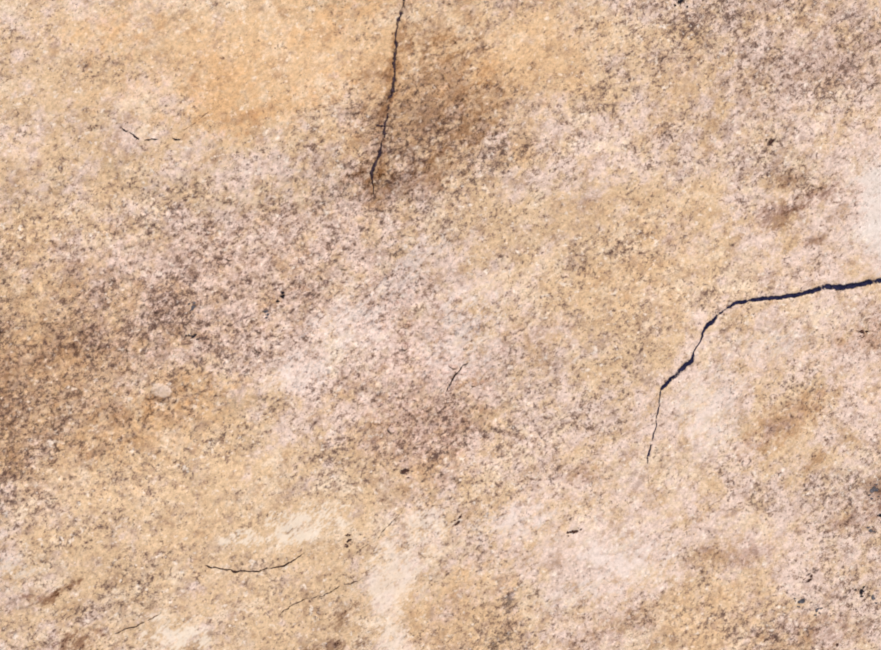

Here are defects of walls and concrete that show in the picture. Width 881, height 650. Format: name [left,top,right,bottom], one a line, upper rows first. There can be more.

crack [370,0,405,192]
crack [647,277,881,497]